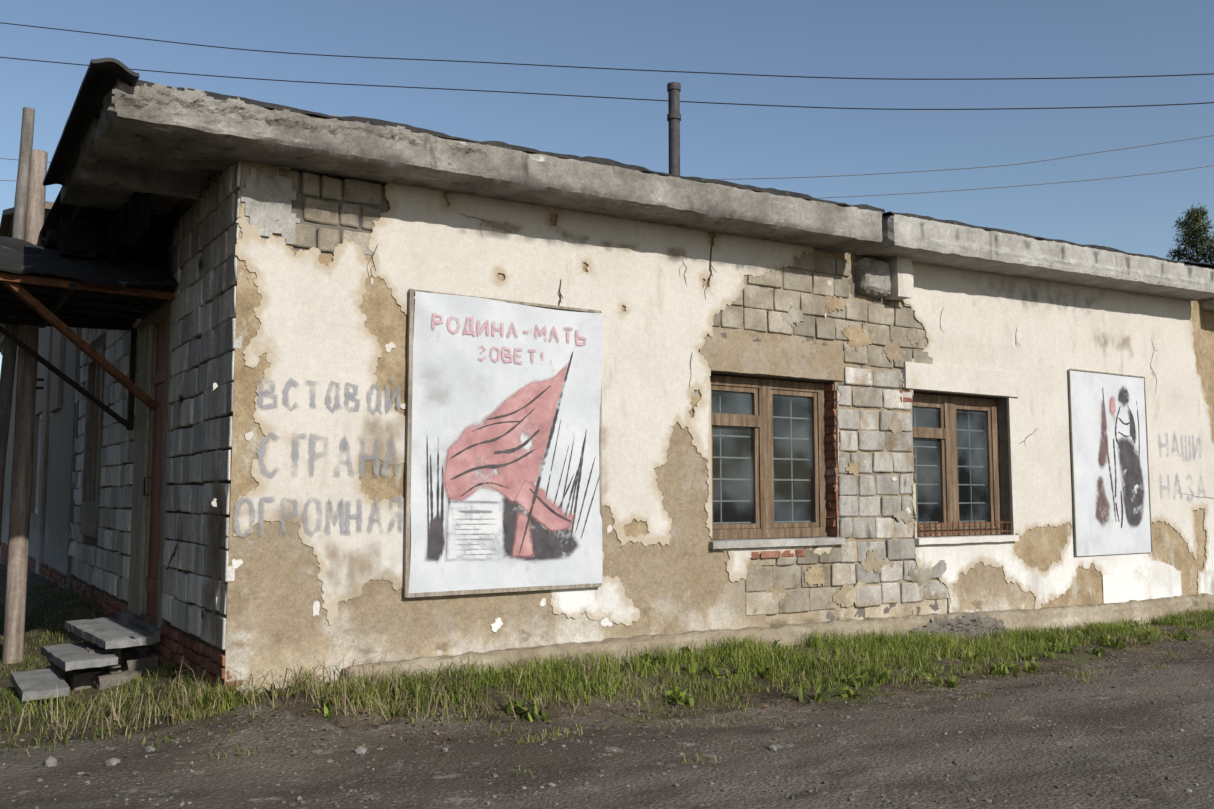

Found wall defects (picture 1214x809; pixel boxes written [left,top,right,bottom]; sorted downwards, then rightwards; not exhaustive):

crack [679,237,716,299]
flaking render [1190,299,1214,445]
flaking render [210,259,806,695]
flaking render [1014,522,1071,572]
flaking render [1150,509,1206,596]
flaking render [912,562,1104,641]